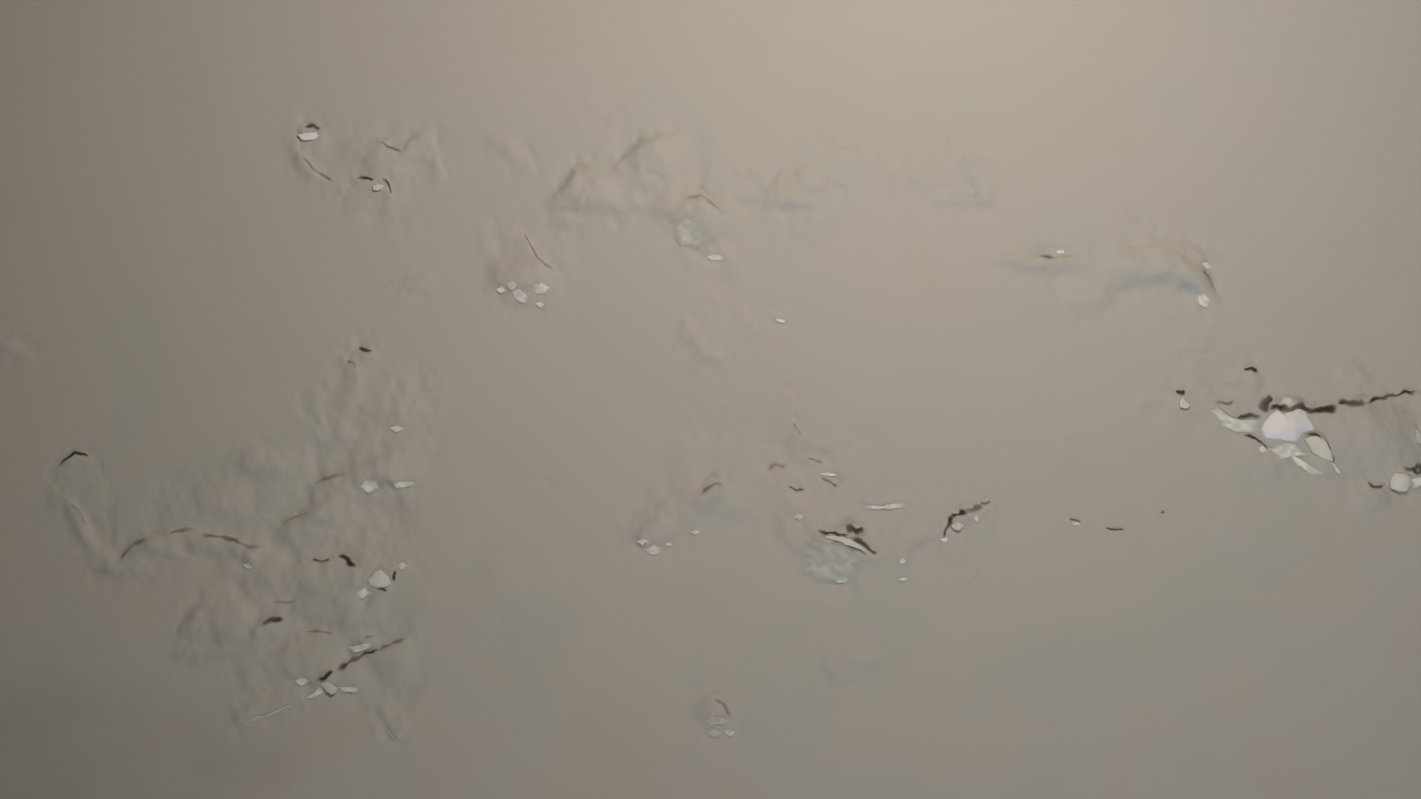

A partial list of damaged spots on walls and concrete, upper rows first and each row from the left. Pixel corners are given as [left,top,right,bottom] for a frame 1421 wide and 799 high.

spalling [1116,343,1421,538]